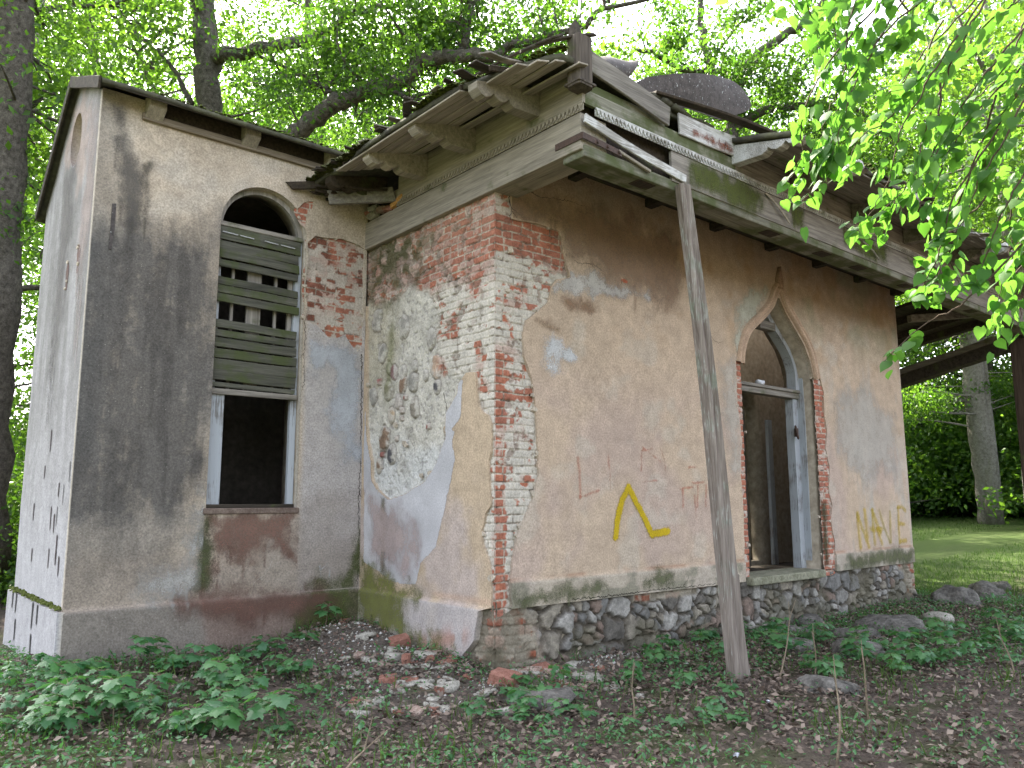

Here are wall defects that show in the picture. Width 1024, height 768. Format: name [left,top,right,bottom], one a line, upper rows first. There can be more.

water stain [118,136,152,228]
spalling [294,192,631,670]
spalling [723,287,768,577]
spalling [810,377,835,576]
water stain [148,510,214,594]
water stain [295,539,449,654]
water stain [513,581,607,608]
water stain [644,569,674,587]